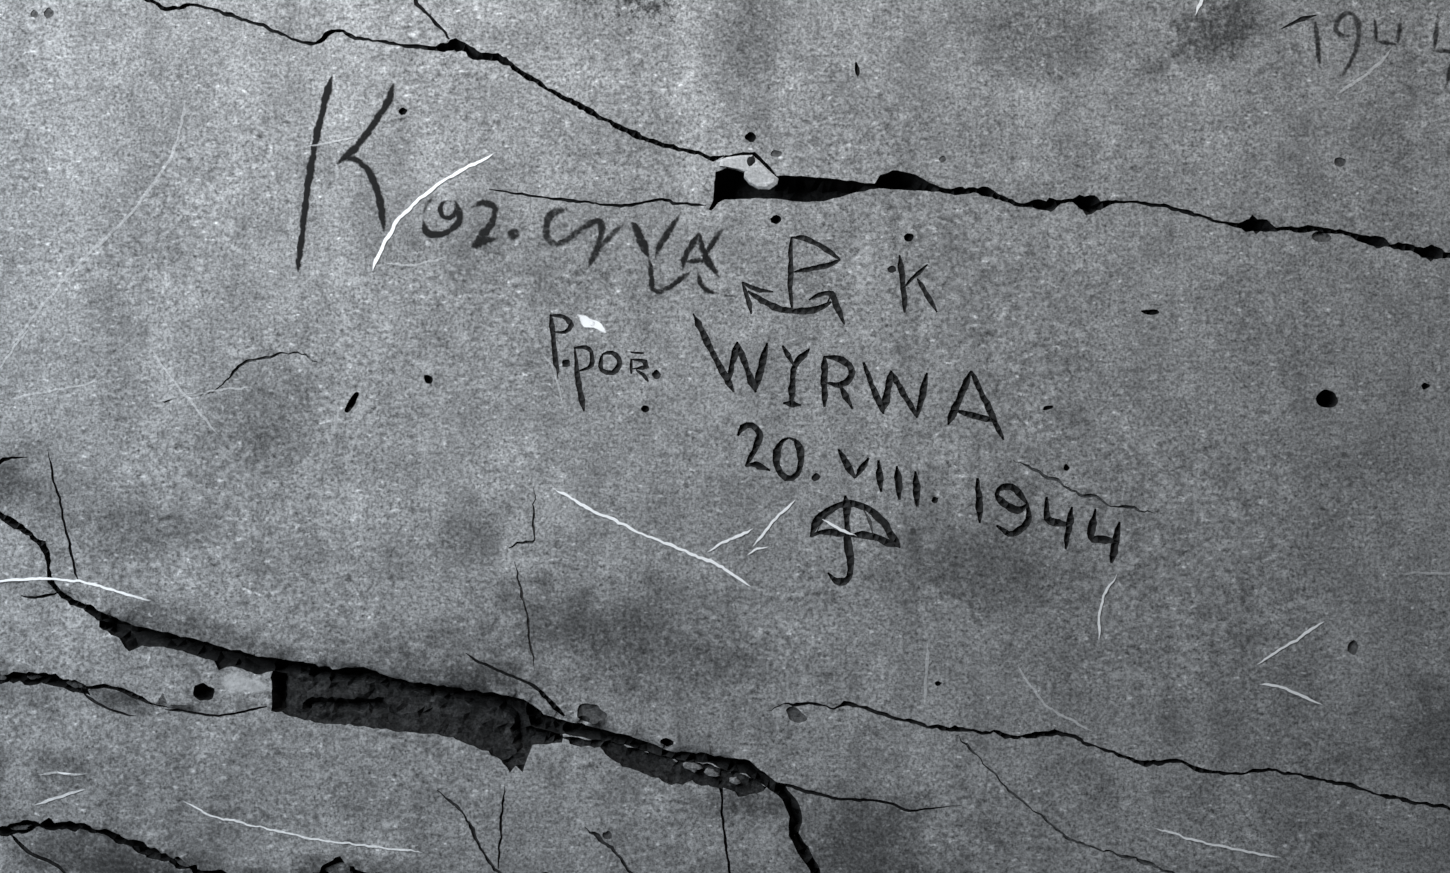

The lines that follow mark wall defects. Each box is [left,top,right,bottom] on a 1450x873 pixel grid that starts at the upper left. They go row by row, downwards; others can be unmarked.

flaking render [719,132,782,190]
crack [144,0,1450,262]
crack [154,351,318,403]
crack [1013,460,1153,513]
crack [0,452,310,717]
crack [466,488,960,873]
spalling [270,658,766,797]
crack [0,818,227,873]
crack [313,856,380,873]
crack [437,786,505,873]
crack [768,701,1450,873]